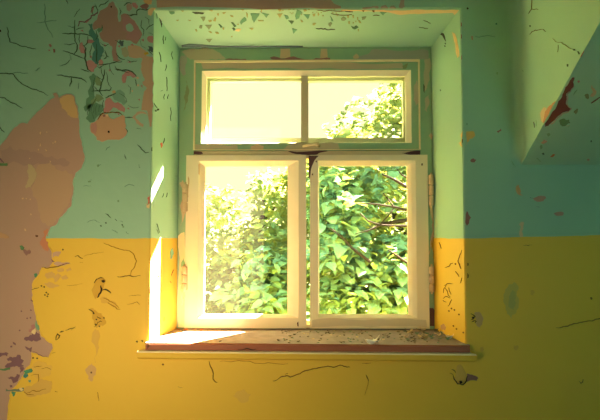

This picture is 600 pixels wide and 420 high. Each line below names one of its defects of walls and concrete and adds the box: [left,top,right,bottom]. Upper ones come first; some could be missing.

crack [0,68,48,96]
crack [37,0,173,132]
flaking render [79,0,462,143]
flaking render [540,76,580,157]
flaking render [0,92,86,420]
crack [44,214,140,277]
crack [443,250,462,306]
crack [209,348,369,393]